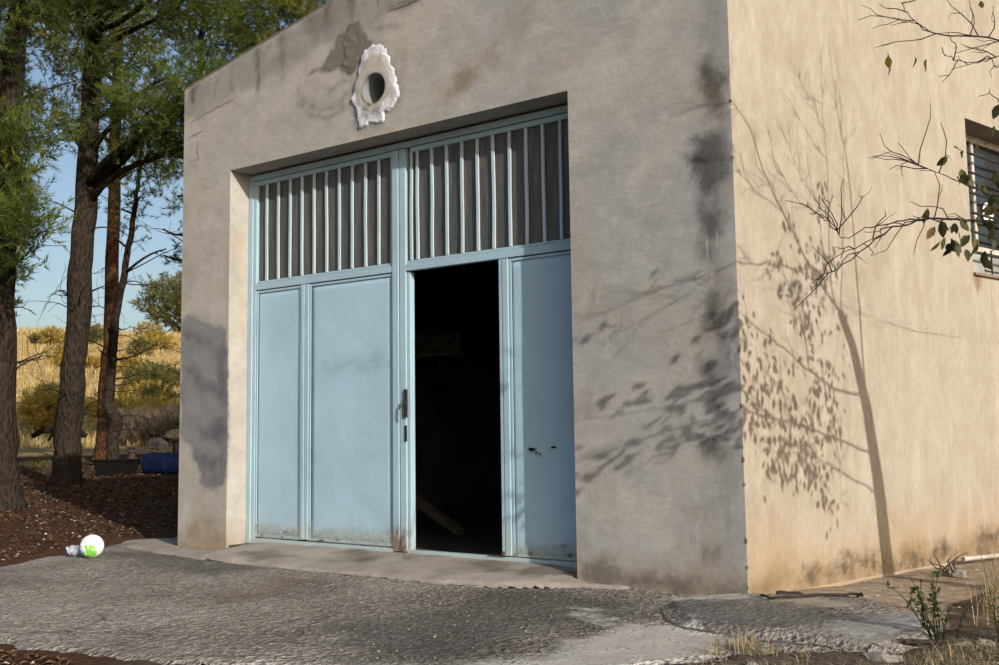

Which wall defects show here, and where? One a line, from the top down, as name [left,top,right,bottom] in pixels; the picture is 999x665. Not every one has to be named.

spalling [310,22,371,74]
damp [703,62,723,108]
damp [693,137,727,193]